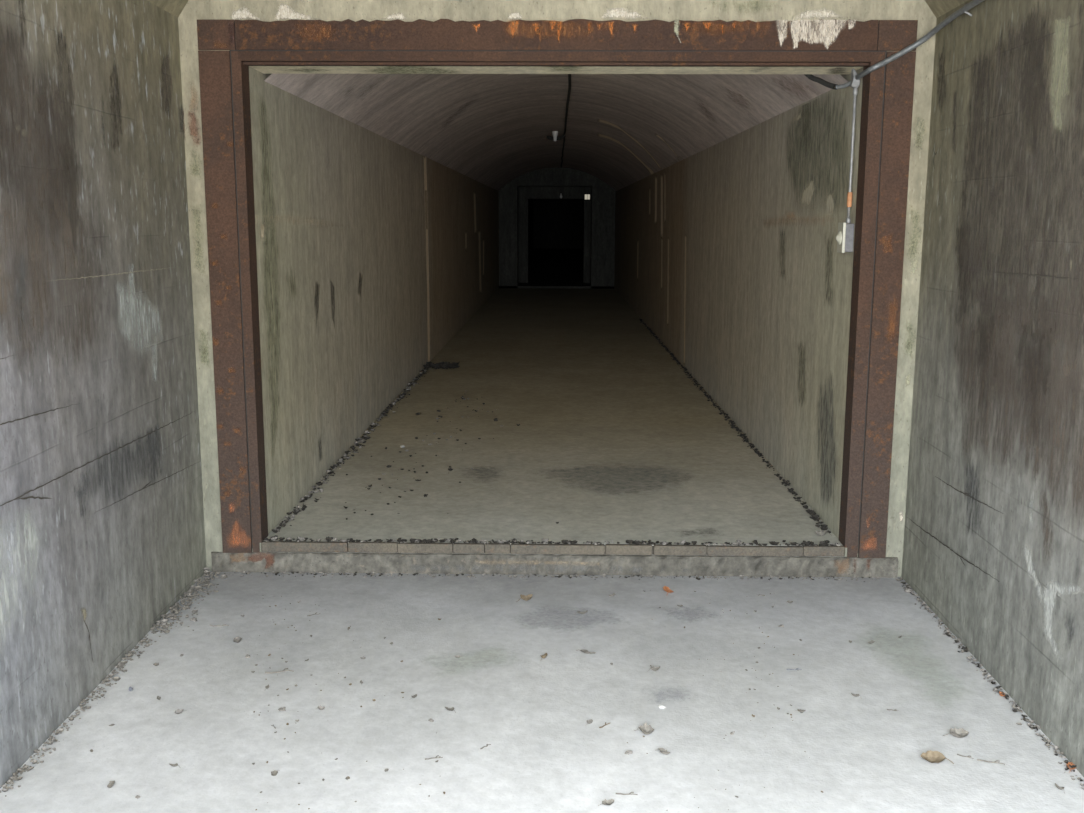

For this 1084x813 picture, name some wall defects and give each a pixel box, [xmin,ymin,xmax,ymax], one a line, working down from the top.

water stain [232,8,255,19]
water stain [276,5,310,20]
rust [506,21,570,40]
water stain [603,9,640,17]
water stain [778,9,854,49]
water stain [102,66,122,149]
water stain [0,0,101,356]
water stain [120,268,160,379]
water stain [938,10,1084,556]
crack [0,404,75,425]
crack [0,411,196,509]
water stain [1025,548,1074,652]